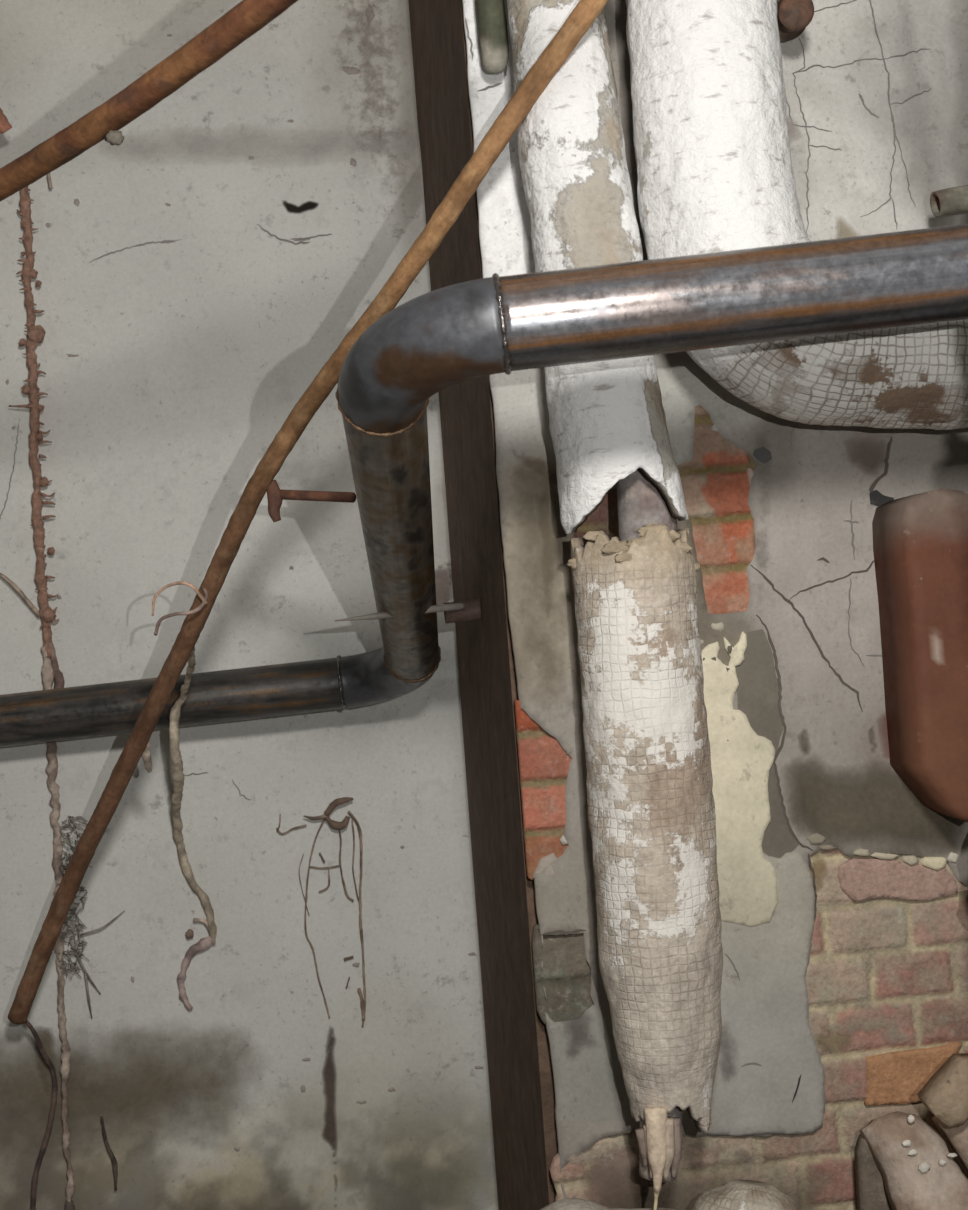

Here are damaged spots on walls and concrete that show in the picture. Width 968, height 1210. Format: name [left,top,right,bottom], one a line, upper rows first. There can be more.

crack [786,0,932,234]
crack [0,420,20,519]
crack [750,436,892,712]
spalling [514,700,571,880]
crack [756,614,817,920]
spalling [641,405,968,1210]
spalling [532,924,594,1024]
leakage [0,1031,233,1134]
leakage [323,1030,336,1149]
spalling [549,1129,639,1208]